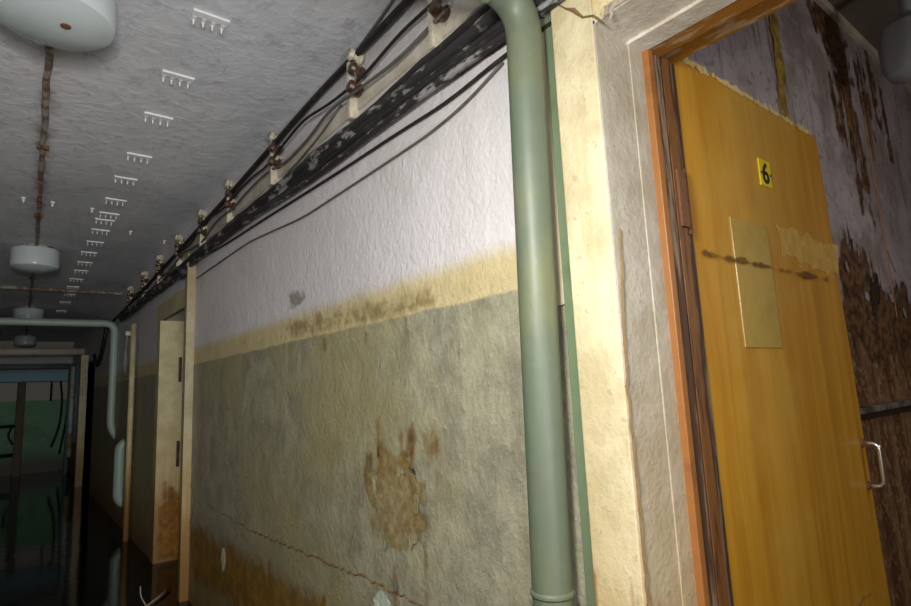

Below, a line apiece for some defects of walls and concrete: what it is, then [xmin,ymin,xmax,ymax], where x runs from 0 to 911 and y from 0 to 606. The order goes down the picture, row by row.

peeling [838,227,911,383]
crack [190,483,424,606]
peeling [366,430,426,550]
crack [620,228,651,606]